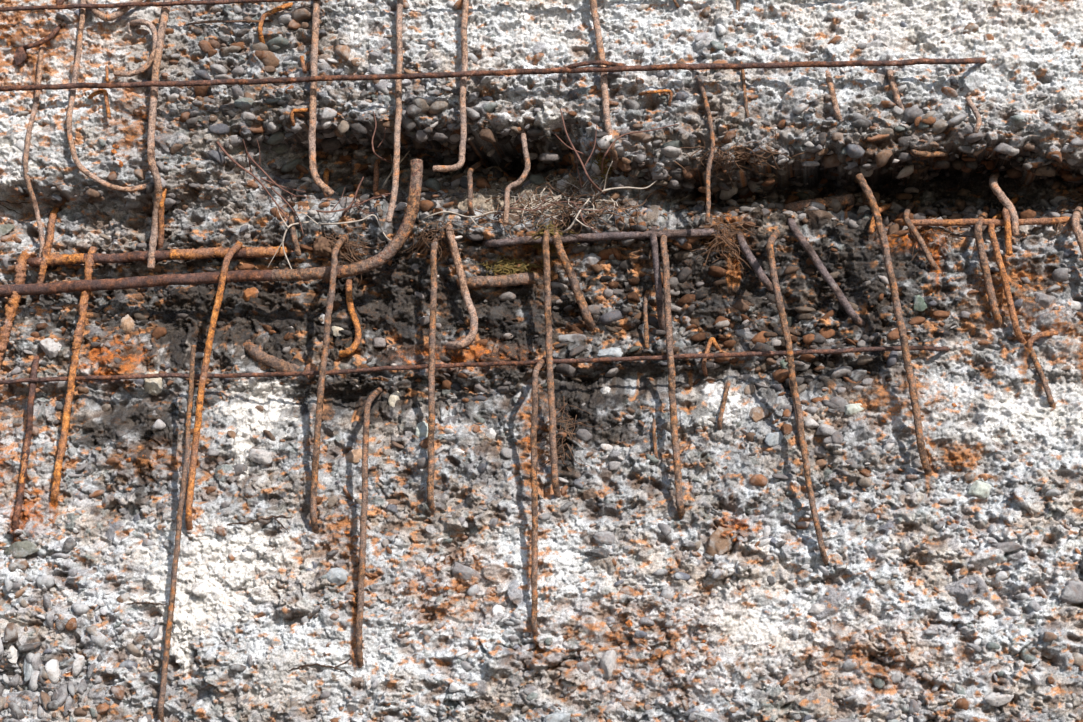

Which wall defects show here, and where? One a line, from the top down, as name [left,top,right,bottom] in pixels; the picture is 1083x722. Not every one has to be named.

rust [0,0,99,85]
rust [106,89,149,168]
rust [0,218,55,352]
rust [72,246,146,376]
rust [887,216,945,279]
rust [970,263,1036,365]
rust [851,383,934,423]
rust [11,438,59,543]
rust [925,435,984,484]
rust [318,507,359,664]
rust [396,561,484,628]
rust [565,605,727,690]